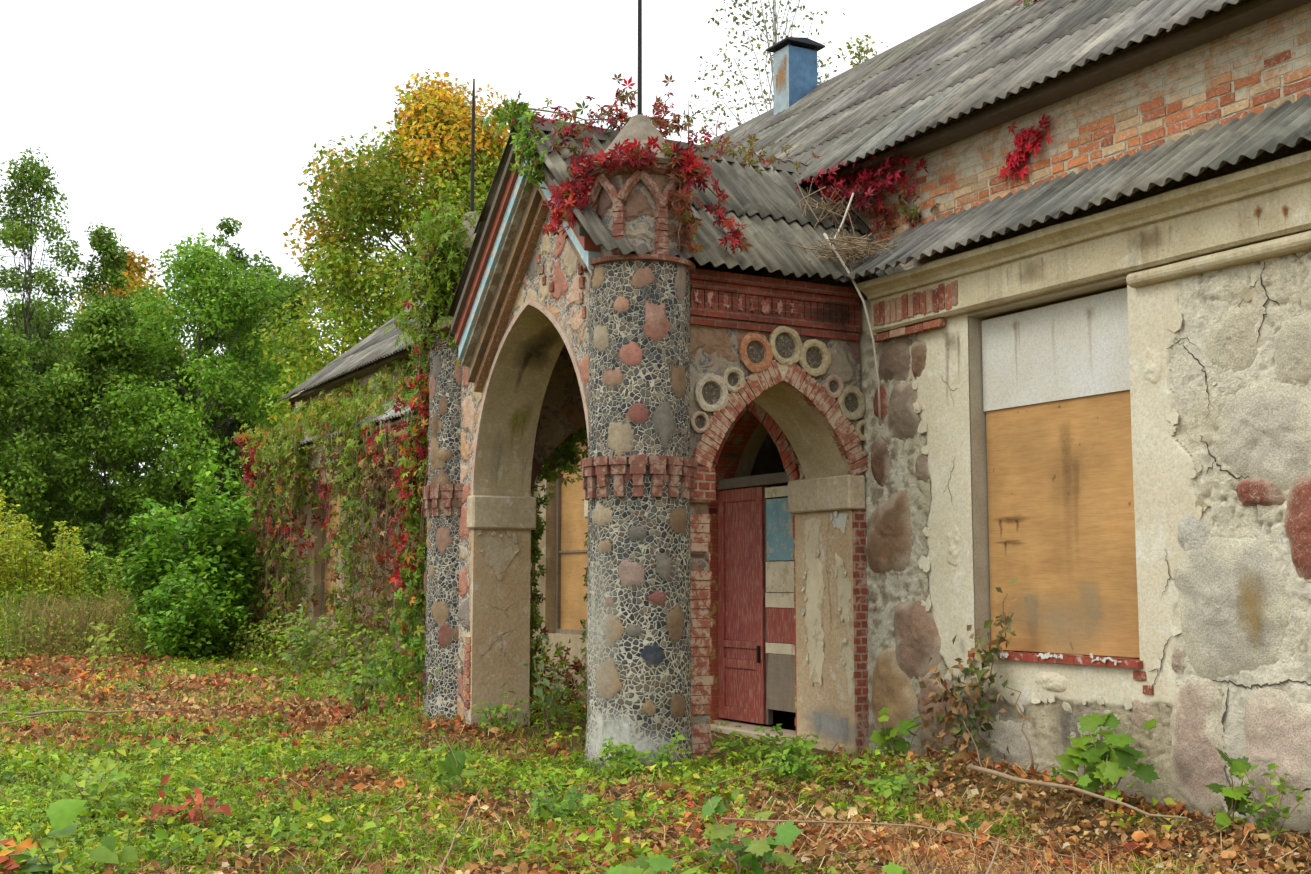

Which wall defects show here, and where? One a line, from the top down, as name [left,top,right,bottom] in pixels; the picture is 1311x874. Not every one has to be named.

crack [1238,262,1281,342]
crack [1166,337,1249,479]
spalling [800,250,1311,836]
crack [1149,636,1172,686]